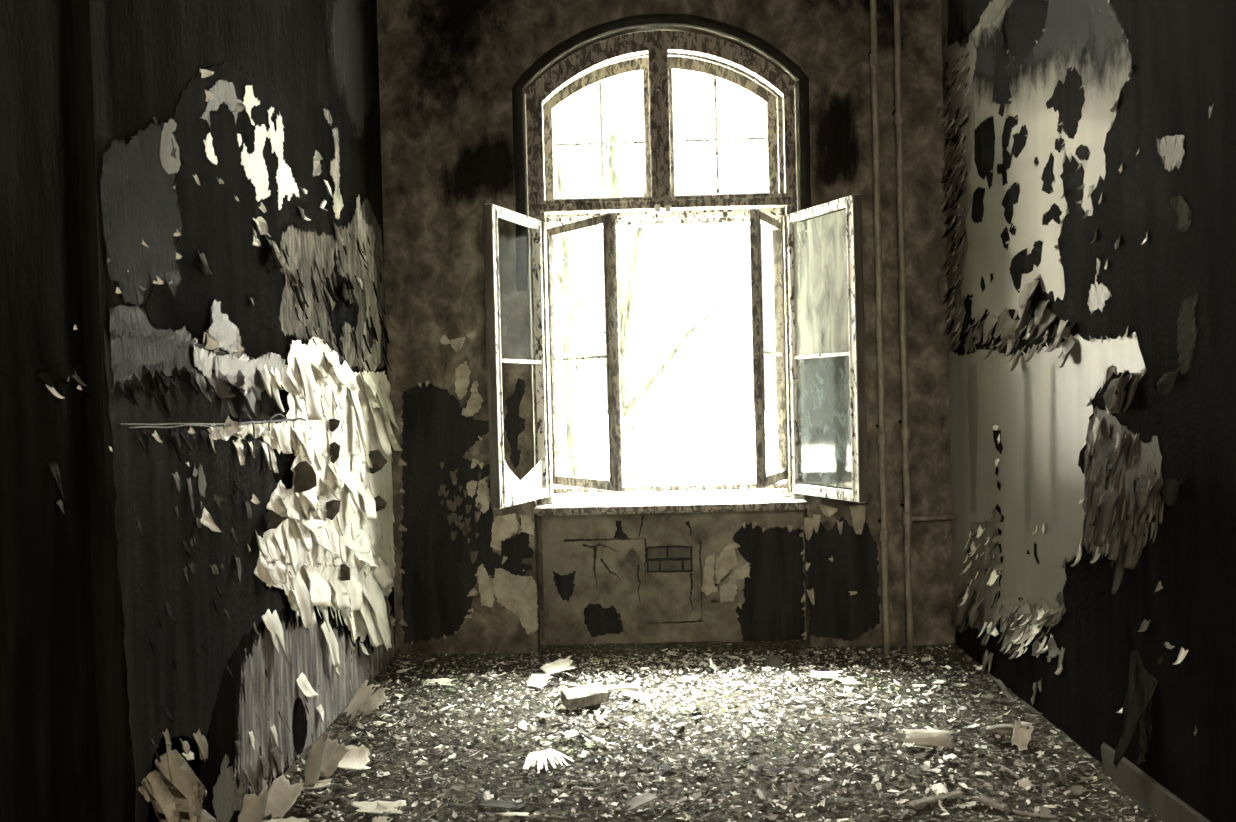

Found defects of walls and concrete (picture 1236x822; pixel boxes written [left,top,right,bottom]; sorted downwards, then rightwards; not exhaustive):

flaking render [0,60,538,822]
flaking render [937,0,1236,822]
peeling [526,655,577,689]
flaking render [552,571,576,601]
flaking render [583,604,623,637]
flaking render [614,504,881,668]